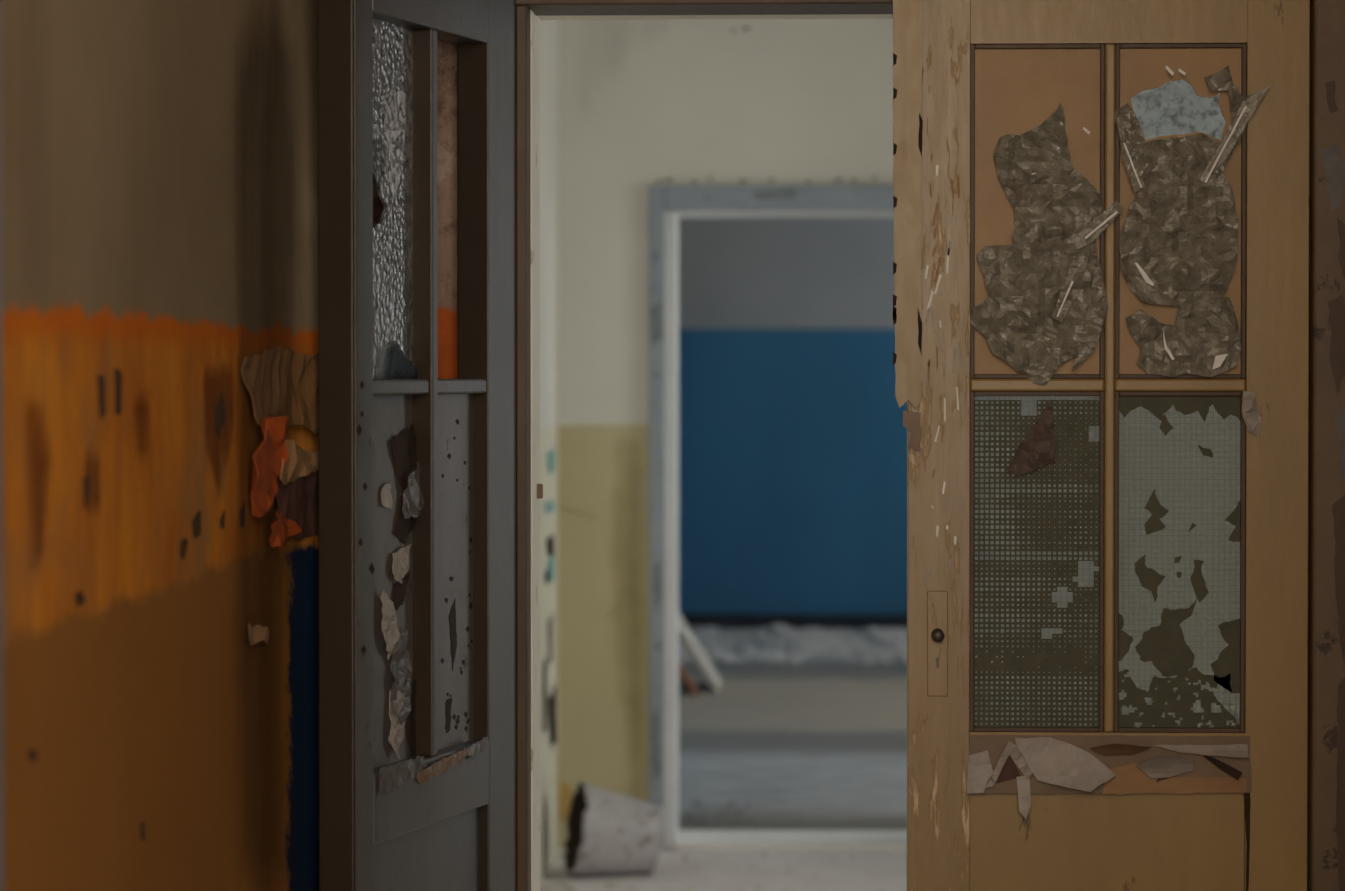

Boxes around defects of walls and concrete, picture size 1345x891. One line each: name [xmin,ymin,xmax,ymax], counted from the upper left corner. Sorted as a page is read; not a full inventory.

peeling [97,368,122,420]
peeling [220,347,319,548]
peeling [180,511,201,560]
peeling [248,624,269,646]